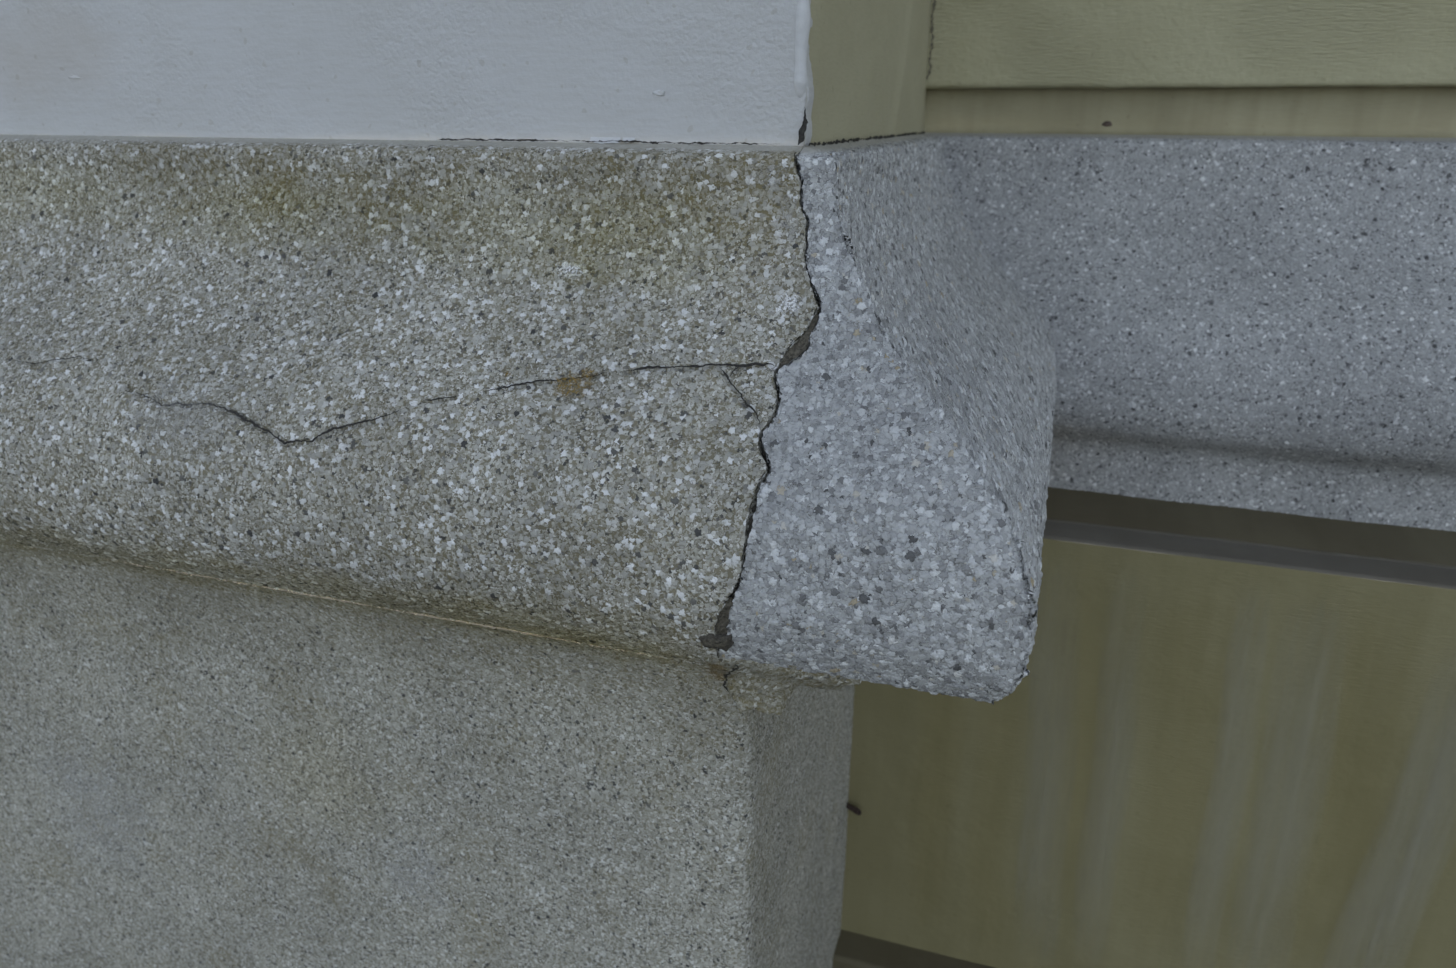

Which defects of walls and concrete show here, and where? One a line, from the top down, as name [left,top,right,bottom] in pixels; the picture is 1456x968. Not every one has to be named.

crack [125,362,780,599]
spalling [698,597,862,716]